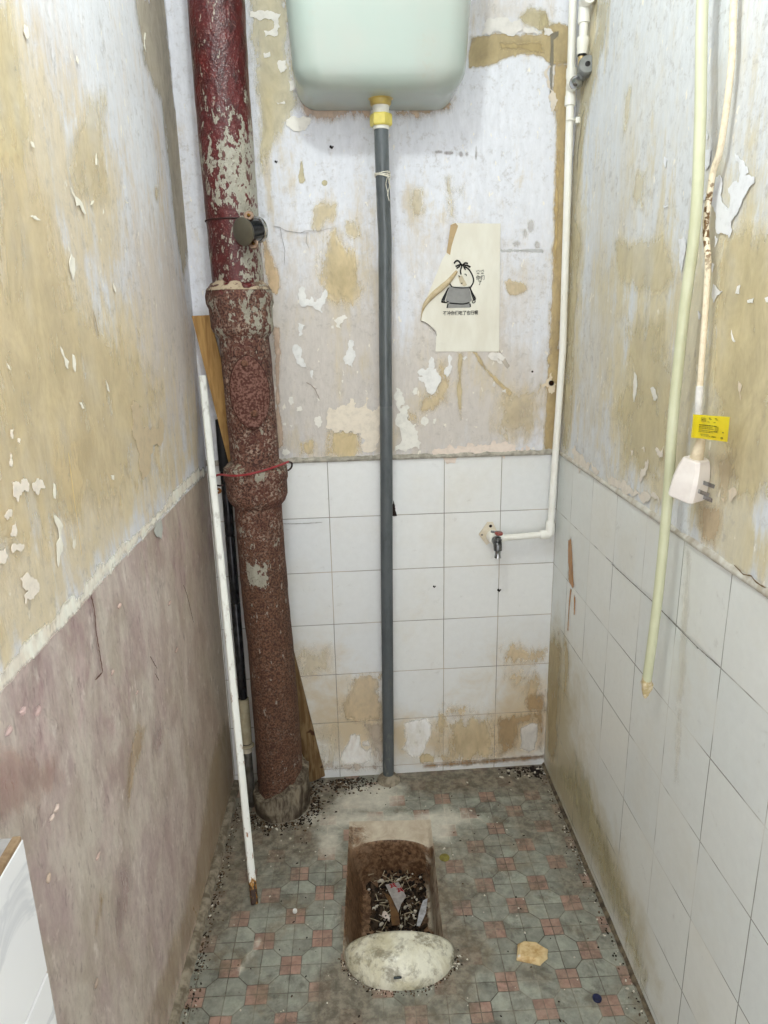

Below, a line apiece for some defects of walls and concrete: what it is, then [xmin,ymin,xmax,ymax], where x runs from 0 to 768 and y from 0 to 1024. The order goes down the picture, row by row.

peeling [250,10,281,37]
peeling [482,17,553,36]
peeling [703,131,754,246]
peeling [298,286,328,313]
peeling [60,346,76,372]
peeling [314,397,380,453]
peeling [394,355,467,452]
peeling [432,440,530,464]
peeling [0,467,206,691]
corrosion [567,539,575,630]
damp [344,676,383,768]
damp [438,679,543,760]